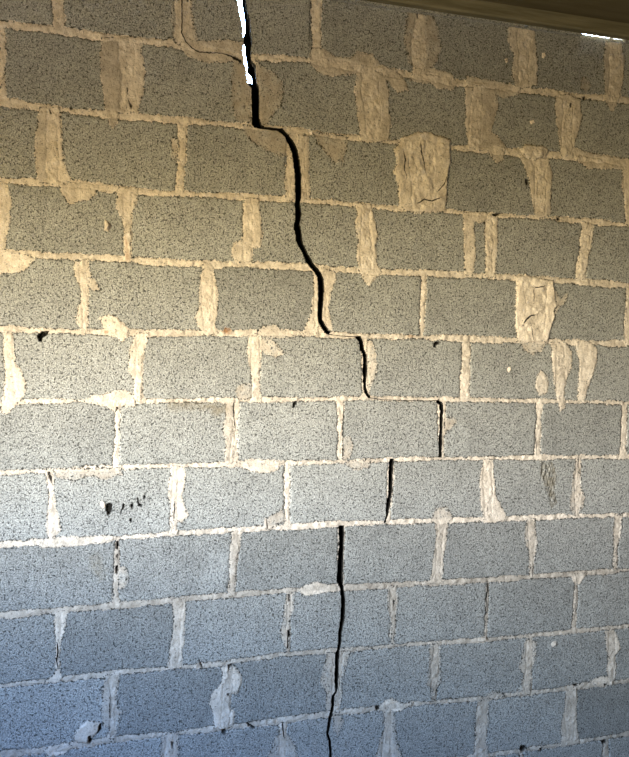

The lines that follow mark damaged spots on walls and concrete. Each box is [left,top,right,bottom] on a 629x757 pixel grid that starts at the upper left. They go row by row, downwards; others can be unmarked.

crack [179,0,445,458]
crack [383,458,395,523]
crack [325,525,346,757]